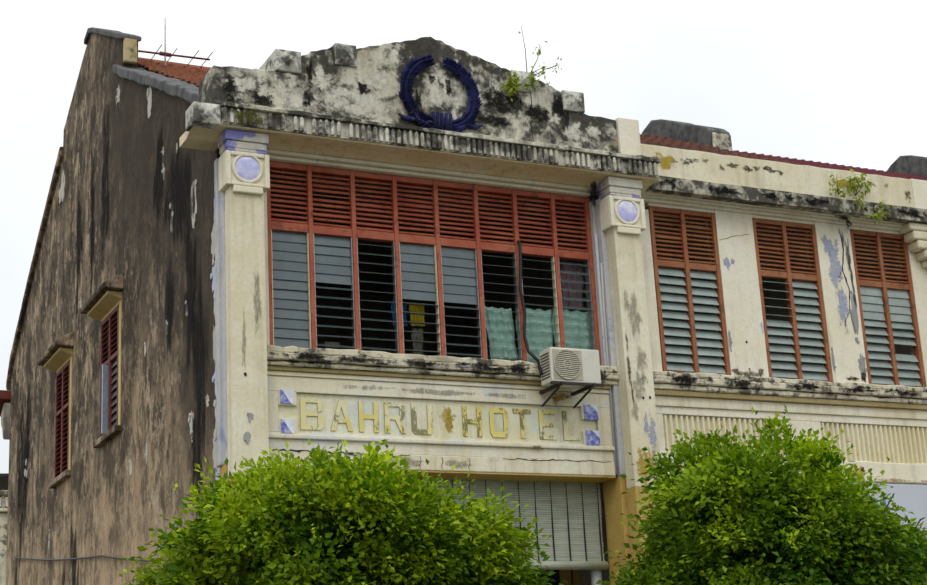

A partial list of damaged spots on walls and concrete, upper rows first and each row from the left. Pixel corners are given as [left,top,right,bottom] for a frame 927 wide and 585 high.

leakage [251,90,274,126]
leakage [303,60,333,107]
leakage [478,86,570,128]
leakage [76,116,110,315]
leakage [761,192,831,205]
leakage [862,191,927,218]
crack [838,228,856,332]
leakage [153,131,208,500]
peeling [821,236,867,377]
leakage [455,362,531,374]
leakage [841,372,927,396]
leakage [14,389,31,585]